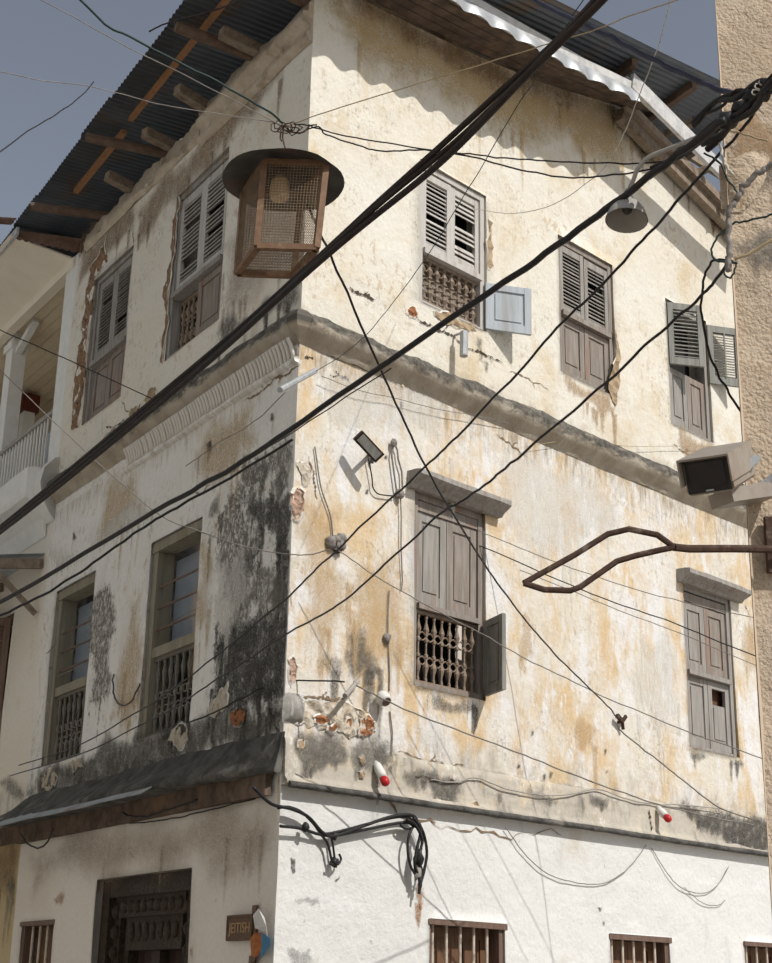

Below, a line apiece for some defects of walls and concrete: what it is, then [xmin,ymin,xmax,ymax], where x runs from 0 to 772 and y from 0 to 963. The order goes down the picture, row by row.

flaking render [70,236,108,430]
flaking render [158,196,180,367]
damp [39,433,292,793]
flaking render [294,700,377,752]
crack [351,796,565,840]
damp [681,801,768,850]